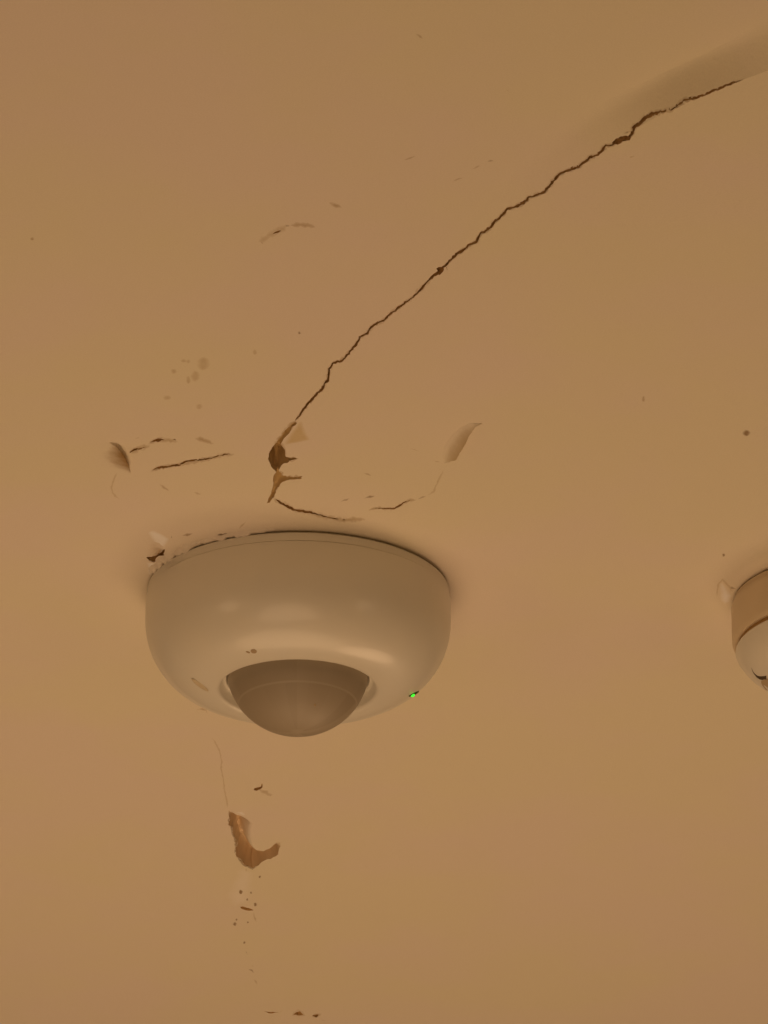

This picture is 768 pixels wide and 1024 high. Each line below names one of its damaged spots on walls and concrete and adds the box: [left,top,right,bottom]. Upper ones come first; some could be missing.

crack [258,222,316,245]
crack [295,78,745,421]
peeling [95,443,131,500]
crack [128,436,235,495]
peeling [267,420,311,503]
crack [273,470,444,523]
peeling [433,423,483,463]
spalling [146,521,275,577]
spalling [224,811,280,926]